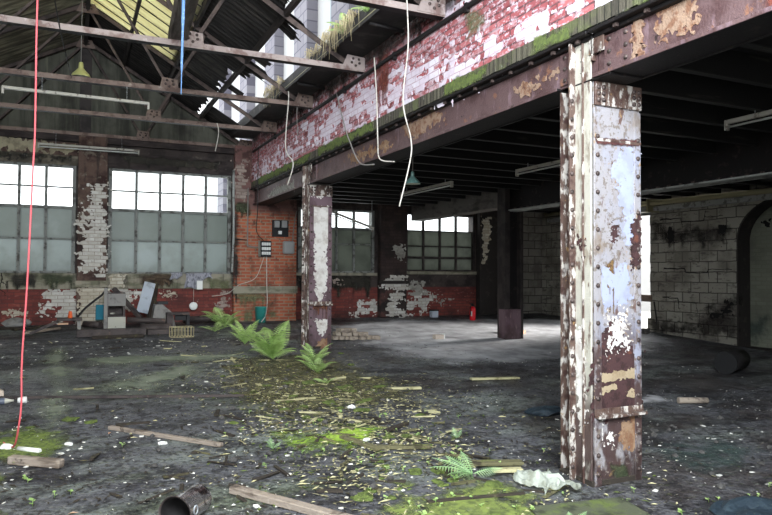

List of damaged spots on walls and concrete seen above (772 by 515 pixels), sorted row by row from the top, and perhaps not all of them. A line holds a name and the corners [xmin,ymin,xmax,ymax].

peeling [443,0,471,19]
corrosion [627,0,702,59]
peeling [230,5,557,202]
peeling [1,182,142,325]
peeling [309,196,344,301]
peeling [349,275,455,318]
peeling [601,262,634,361]
peeling [611,146,642,246]
damp [651,297,741,337]
damp [663,227,731,248]
peeling [575,324,635,436]
corrosion [586,284,644,452]